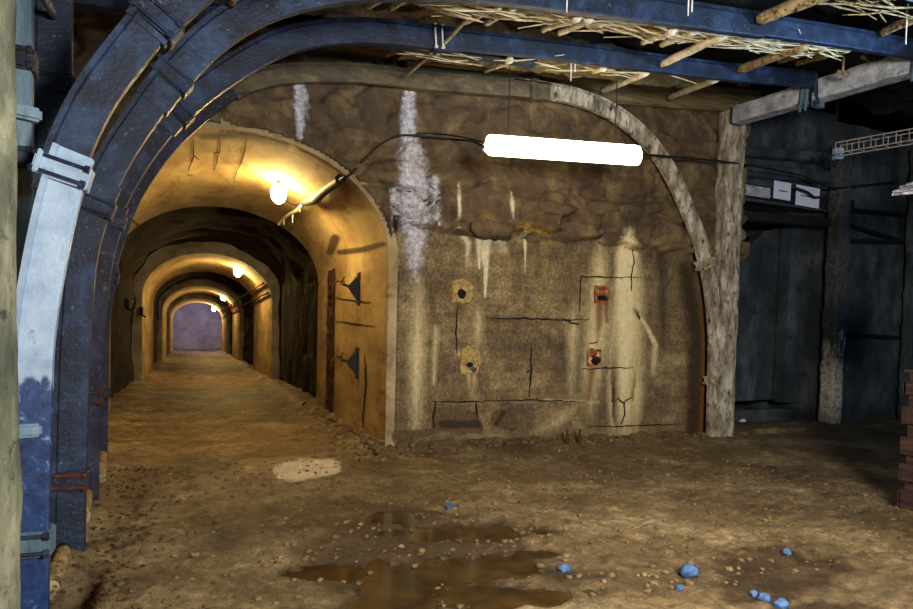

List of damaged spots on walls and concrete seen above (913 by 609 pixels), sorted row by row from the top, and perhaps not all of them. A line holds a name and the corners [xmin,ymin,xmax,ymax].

water stain [293,84,362,207]
water stain [390,90,440,282]
crack [587,397,675,427]